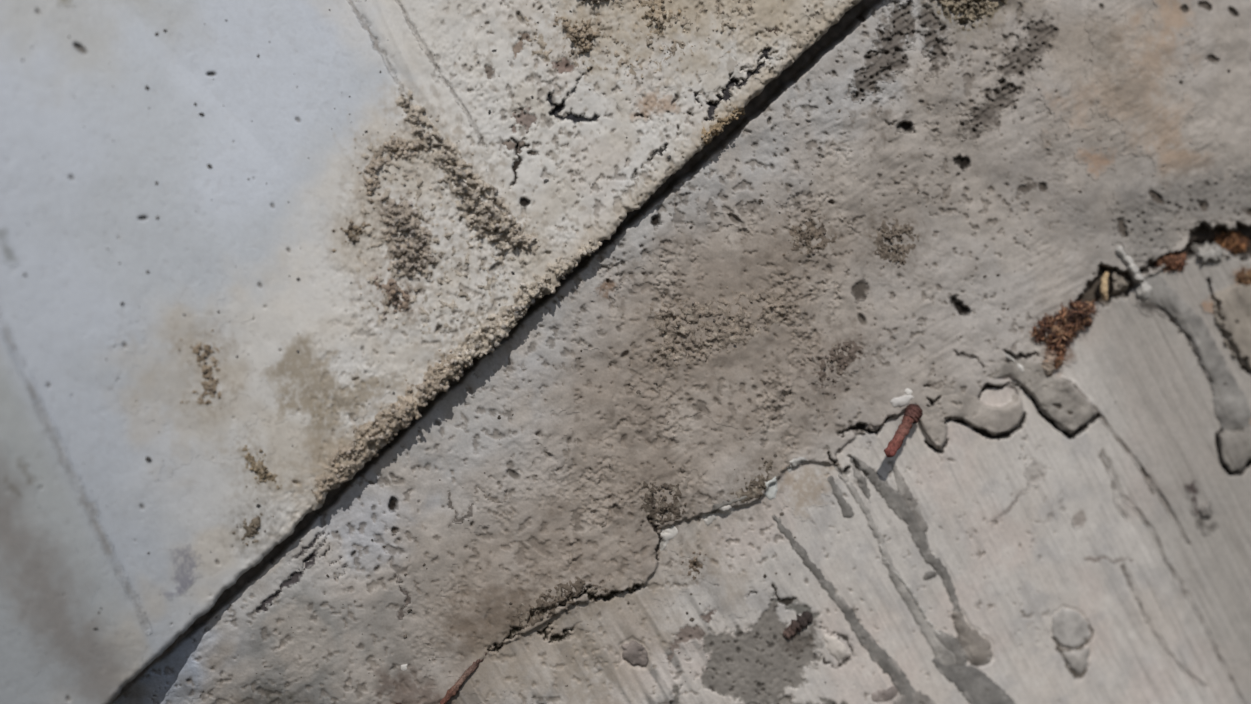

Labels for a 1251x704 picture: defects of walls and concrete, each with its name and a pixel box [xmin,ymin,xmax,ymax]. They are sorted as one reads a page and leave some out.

crack [547,77,600,124]
spalling [868,218,919,267]
spalling [1073,169,1251,306]
spalling [806,340,866,396]
peeling [890,388,914,408]
crack [487,517,663,652]
crack [746,583,798,607]
peeling [666,592,848,704]